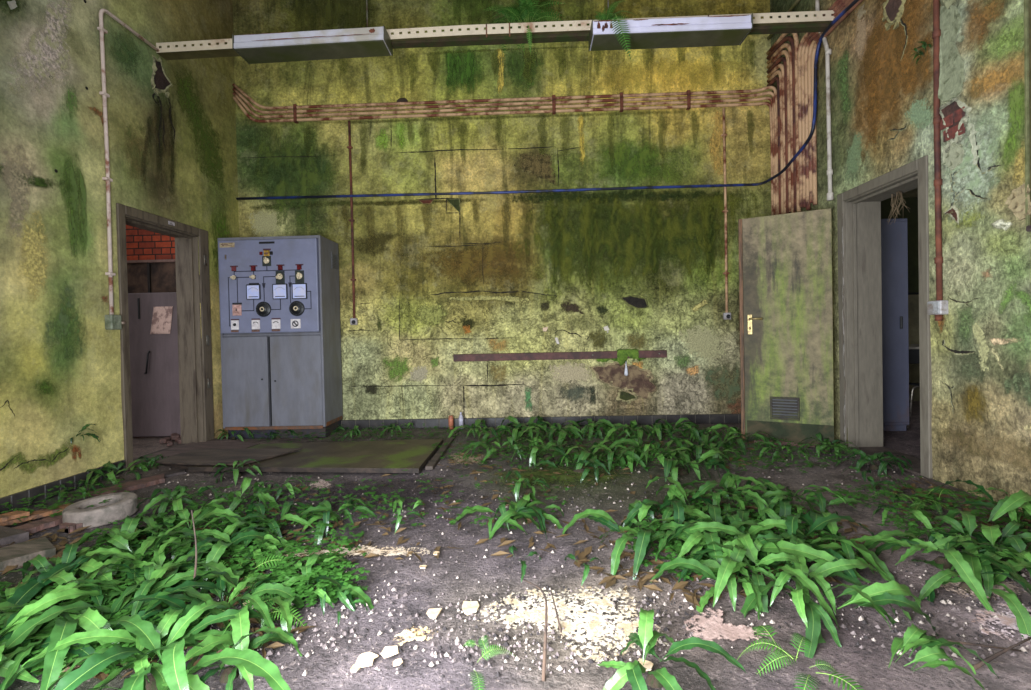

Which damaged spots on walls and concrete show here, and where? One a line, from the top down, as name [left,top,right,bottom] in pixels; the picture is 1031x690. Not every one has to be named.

flaking render [882,0,906,31]
flaking render [151,55,173,98]
leakage [856,0,933,135]
peeling [904,0,998,224]
peeling [1005,184,1031,220]
leakage [0,146,52,295]
leakage [541,301,584,314]
flaking render [620,295,649,310]
leakage [589,331,606,348]
leakage [561,386,596,404]
flaking render [550,361,657,404]
crack [0,445,71,471]